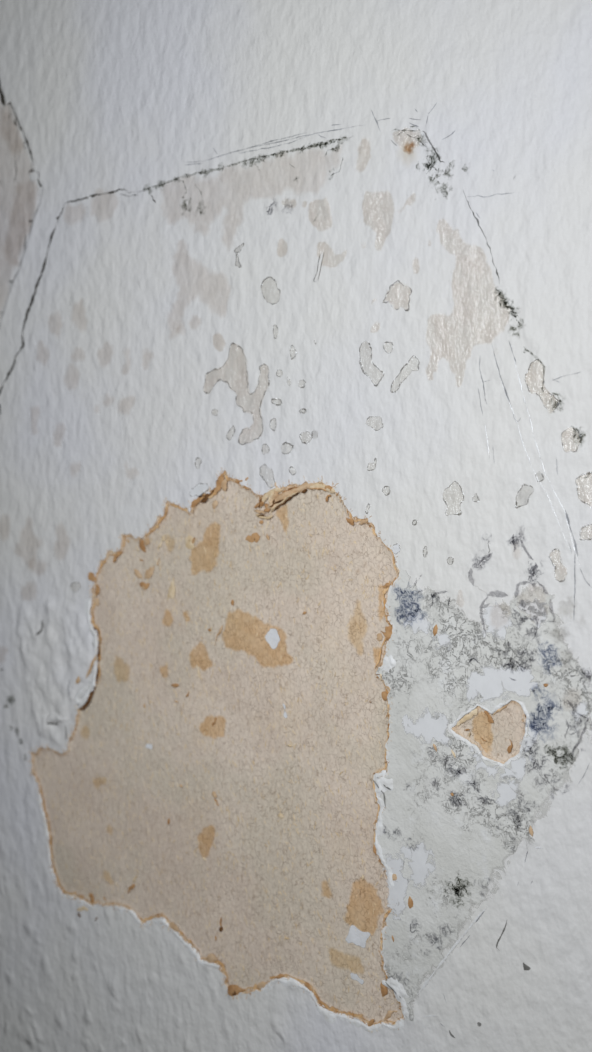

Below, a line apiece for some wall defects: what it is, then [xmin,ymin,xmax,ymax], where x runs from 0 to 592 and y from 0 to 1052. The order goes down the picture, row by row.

crack [0,59,156,412]
peeling [190,483,208,496]